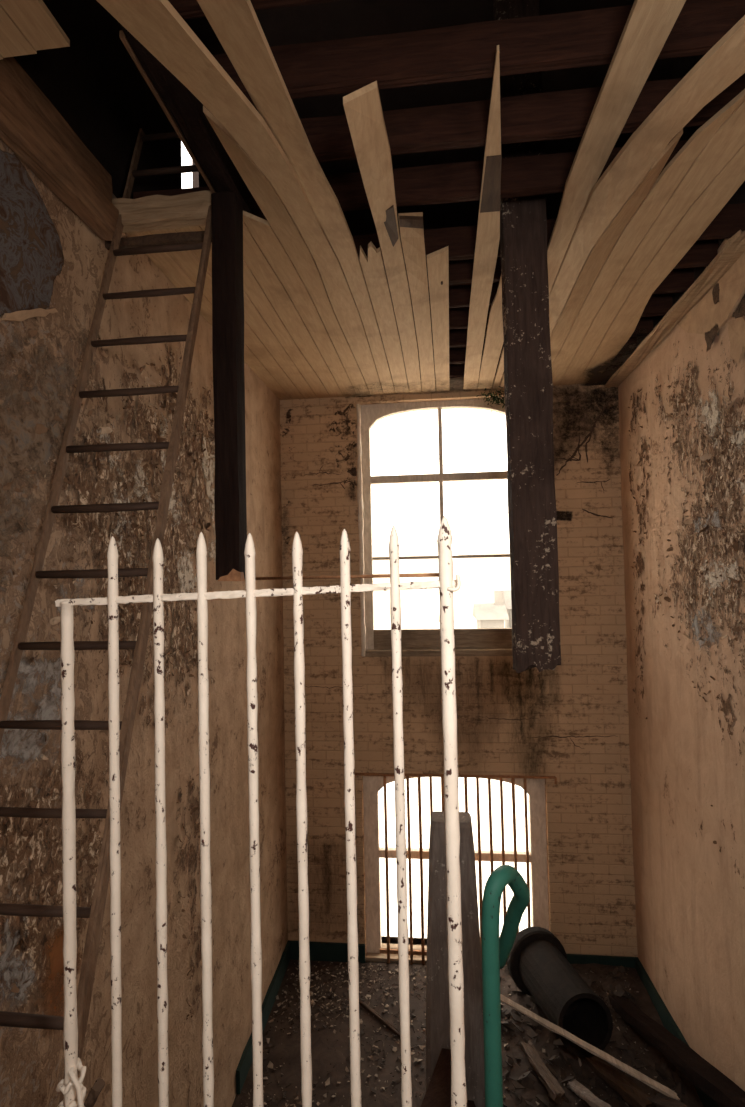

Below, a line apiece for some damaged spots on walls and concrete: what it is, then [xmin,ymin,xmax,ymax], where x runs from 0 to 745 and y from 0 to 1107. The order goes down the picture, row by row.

peeling [0,150,216,747]
peeling [626,252,745,766]
peeling [0,654,63,1015]
peeling [75,730,109,960]
peeling [174,767,215,1020]